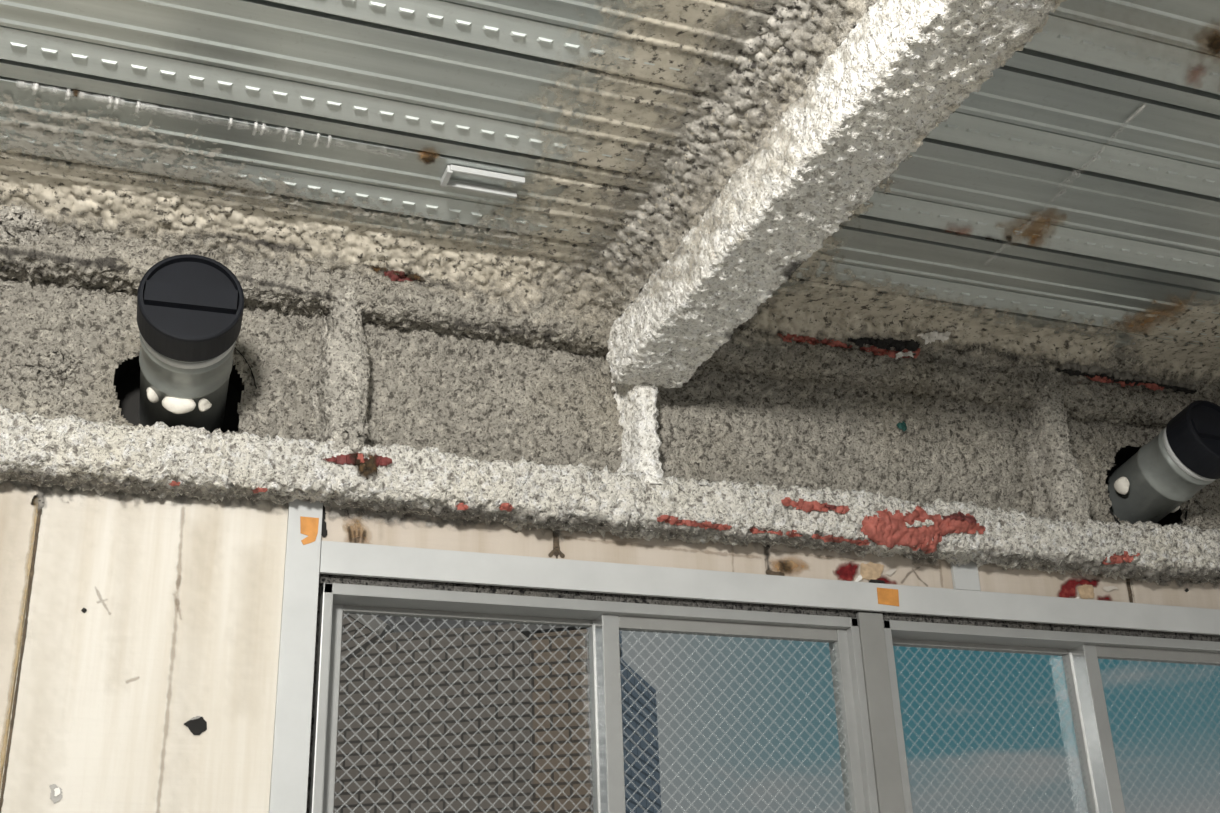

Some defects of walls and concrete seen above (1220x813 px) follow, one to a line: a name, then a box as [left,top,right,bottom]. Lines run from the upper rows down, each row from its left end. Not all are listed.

rust [1207,32,1220,55]
rust [986,213,1058,245]
peeling [777,330,951,359]
peeling [323,451,392,479]
peeling [781,497,850,514]
peeling [657,515,732,531]
peeling [749,506,986,554]
peeling [855,562,896,584]
peeling [1076,584,1118,599]